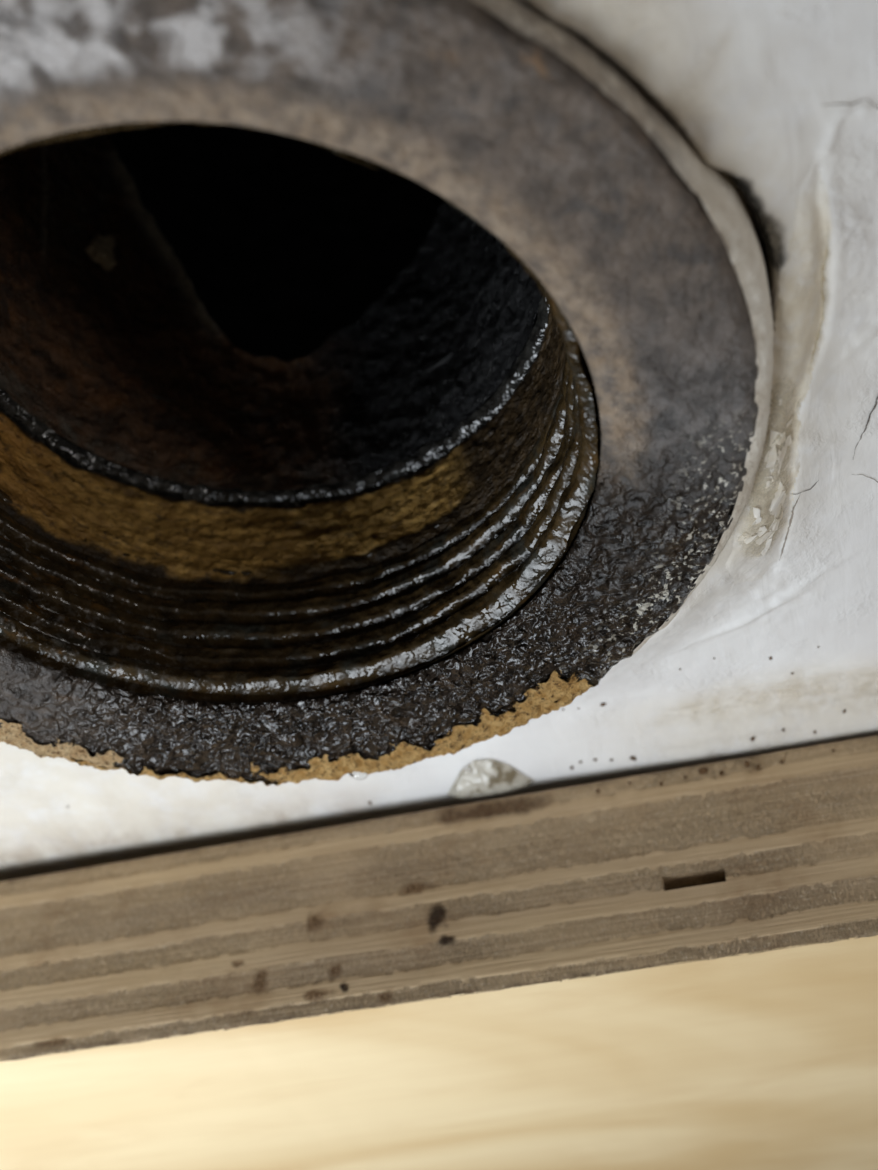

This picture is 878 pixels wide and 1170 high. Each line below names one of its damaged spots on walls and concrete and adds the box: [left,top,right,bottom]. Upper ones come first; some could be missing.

crack [852,396,878,482]
rust [0,670,601,786]